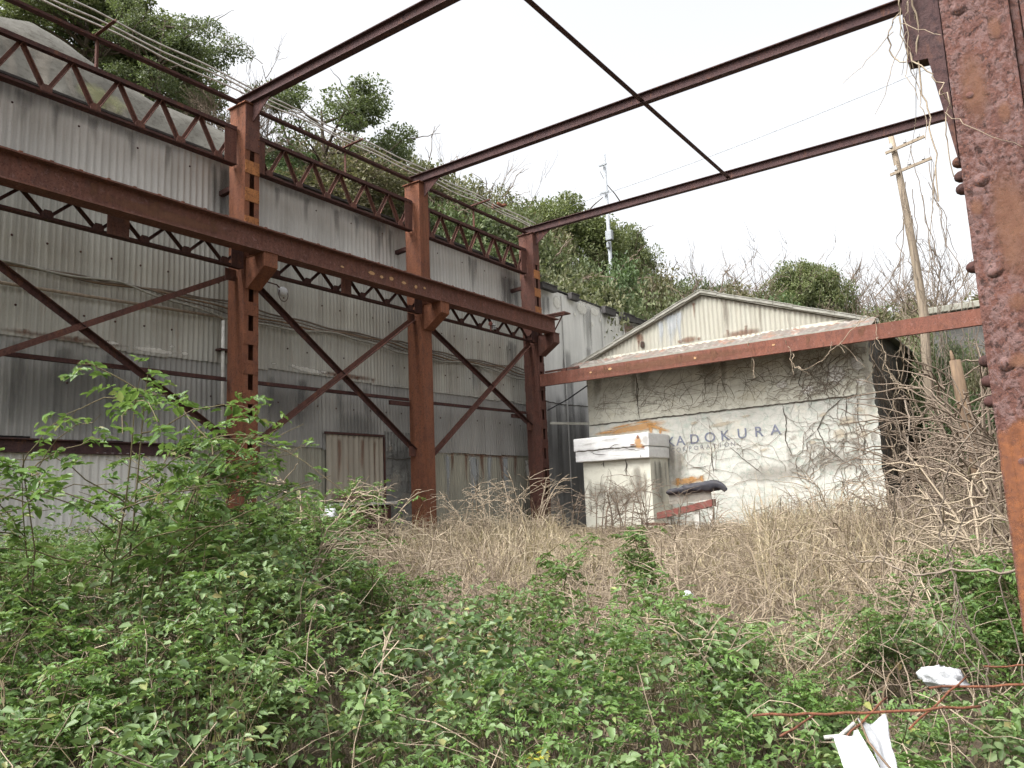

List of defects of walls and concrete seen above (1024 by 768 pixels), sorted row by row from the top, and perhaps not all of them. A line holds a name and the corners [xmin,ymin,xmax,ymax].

corrosion [939,0,1024,633]
corrosion [604,337,726,371]
corrosion [599,420,666,434]